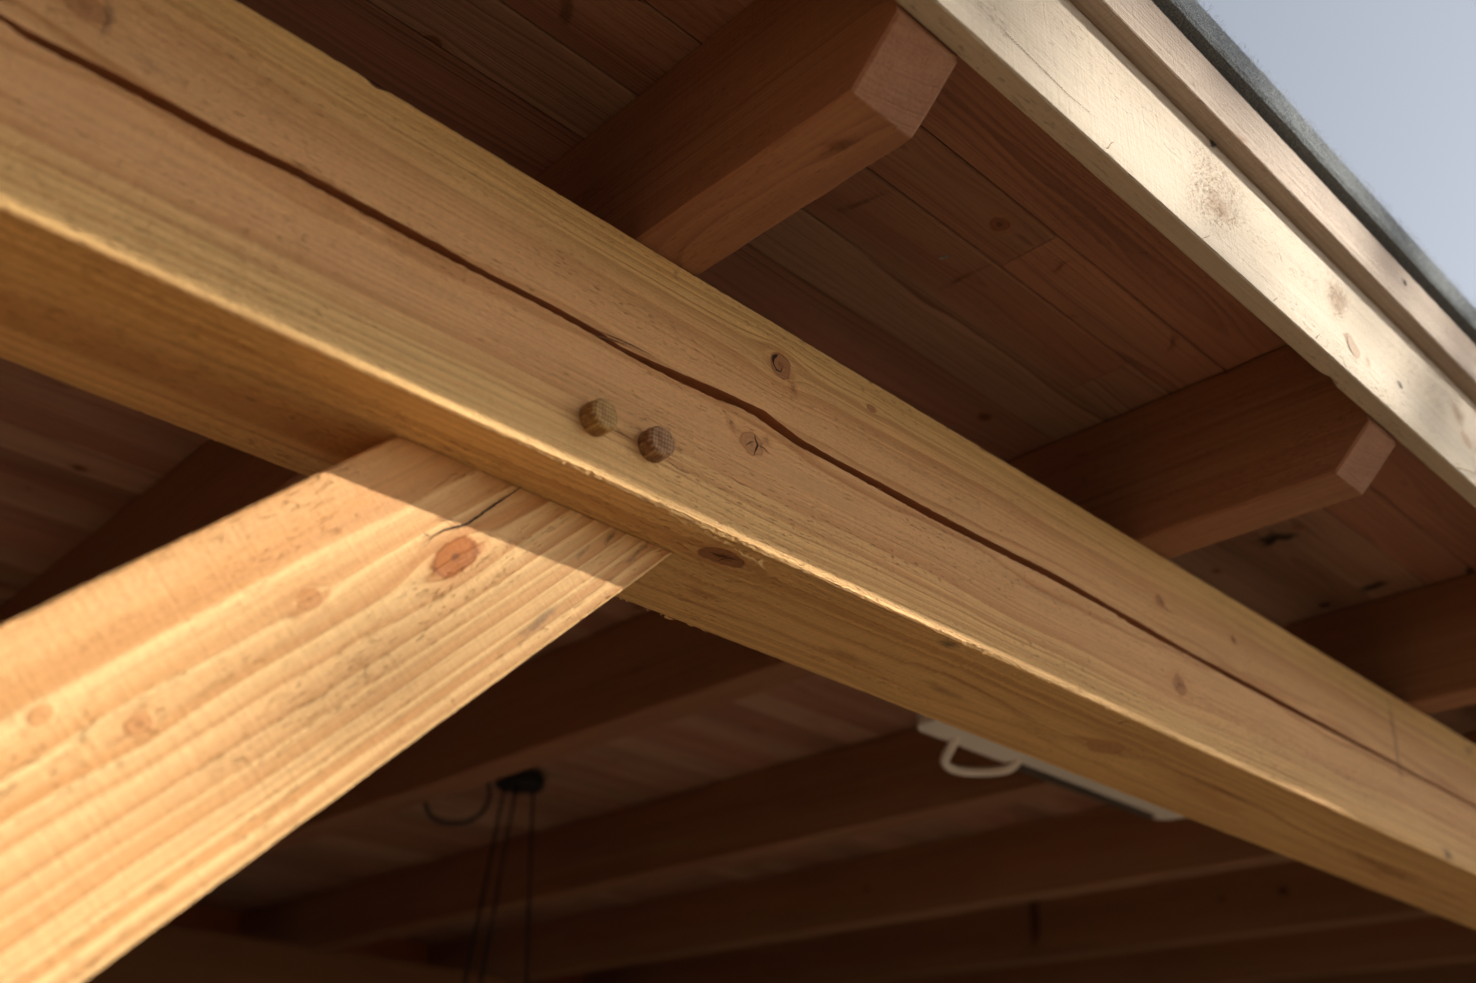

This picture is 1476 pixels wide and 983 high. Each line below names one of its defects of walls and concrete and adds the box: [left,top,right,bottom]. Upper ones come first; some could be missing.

crack [602,332,651,355]
crack [424,487,521,546]